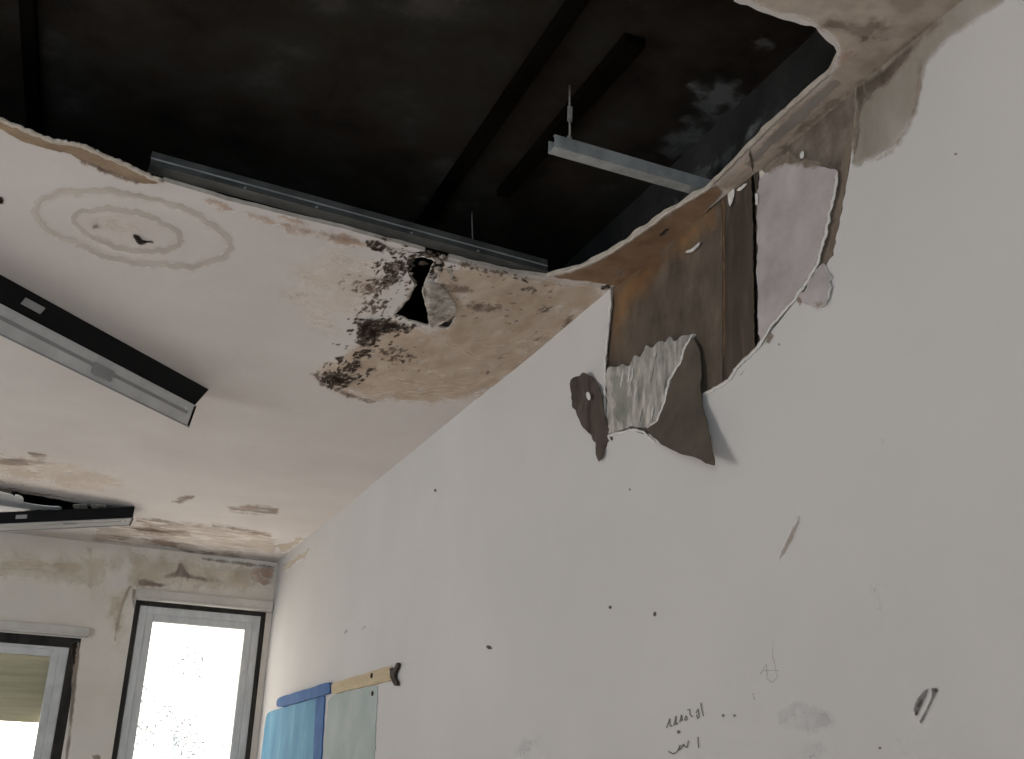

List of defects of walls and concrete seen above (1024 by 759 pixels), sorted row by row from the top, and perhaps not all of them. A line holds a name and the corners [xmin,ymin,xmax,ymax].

damp [32,188,233,270]
damp [314,0,1003,403]
peeling [570,91,858,465]
damp [0,452,110,498]
damp [230,506,277,514]
damp [95,519,309,633]
spalling [914,688,938,723]